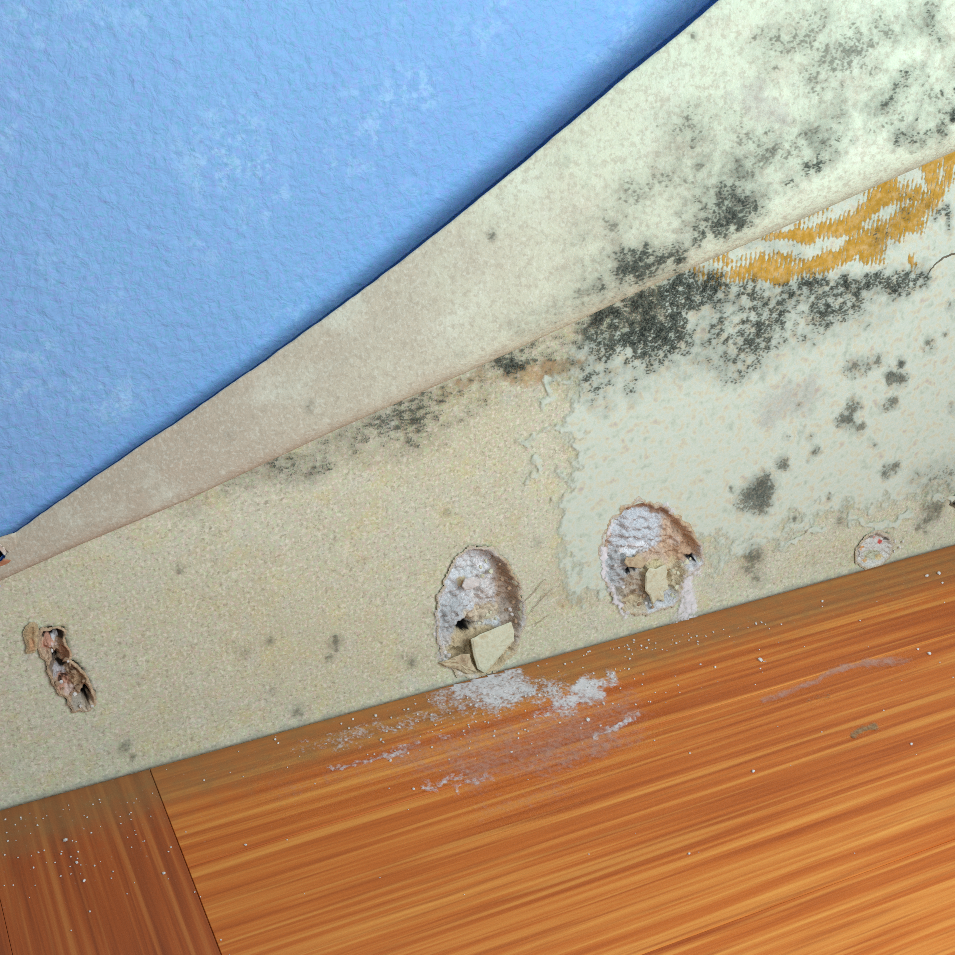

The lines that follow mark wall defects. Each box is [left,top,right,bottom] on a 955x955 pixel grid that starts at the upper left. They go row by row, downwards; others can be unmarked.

damp [752,8,898,103]
damp [869,67,955,153]
peeling [0,0,955,617]
damp [339,109,955,463]
damp [268,439,336,478]
damp [730,458,790,515]
damp [917,502,946,535]
flaking render [435,545,528,679]
damp [600,547,630,619]
damp [674,566,701,623]
damp [743,544,764,581]
flaking render [23,622,97,713]